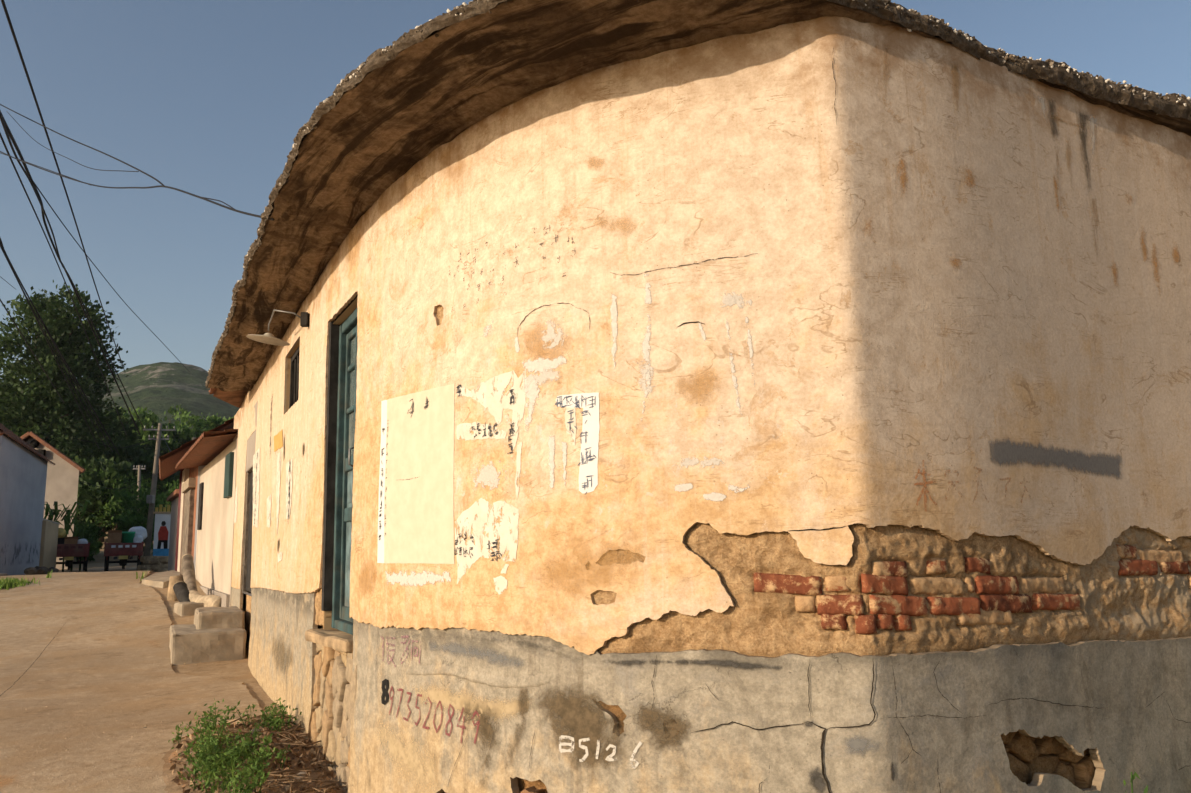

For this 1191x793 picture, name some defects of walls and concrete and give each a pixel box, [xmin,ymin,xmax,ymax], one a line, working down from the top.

damp [1079,113,1096,176]
spalling [599,522,1191,657]
crack [692,661,1097,793]